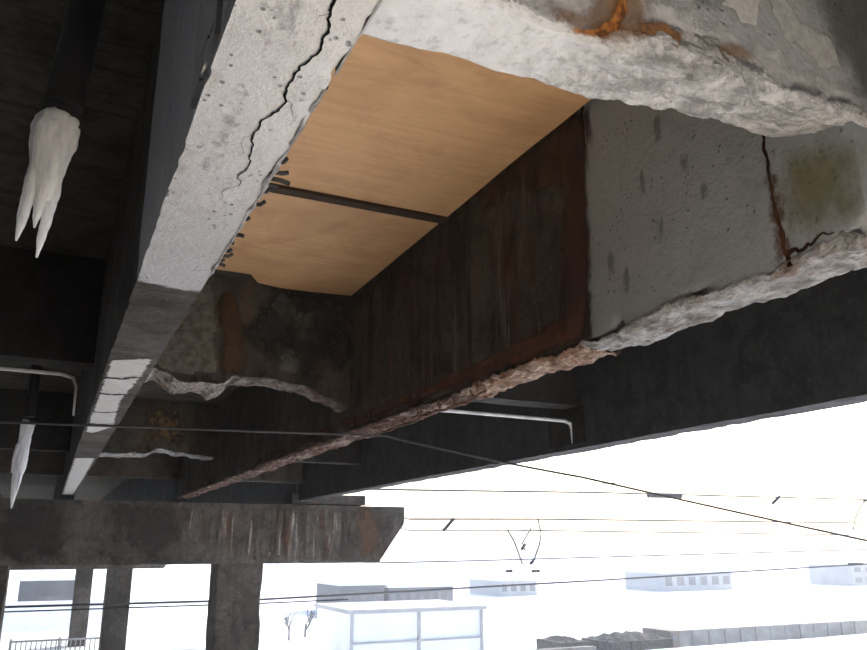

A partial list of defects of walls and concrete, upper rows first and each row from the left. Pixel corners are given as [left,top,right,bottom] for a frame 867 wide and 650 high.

crack [221,0,337,205]
spalling [333,0,867,137]
corrosion [556,0,682,48]
corrosion [719,45,752,59]
crack [762,135,834,267]
peeling [86,359,348,433]
leakage [242,288,351,388]
spalling [177,230,867,499]
peeling [63,448,213,494]